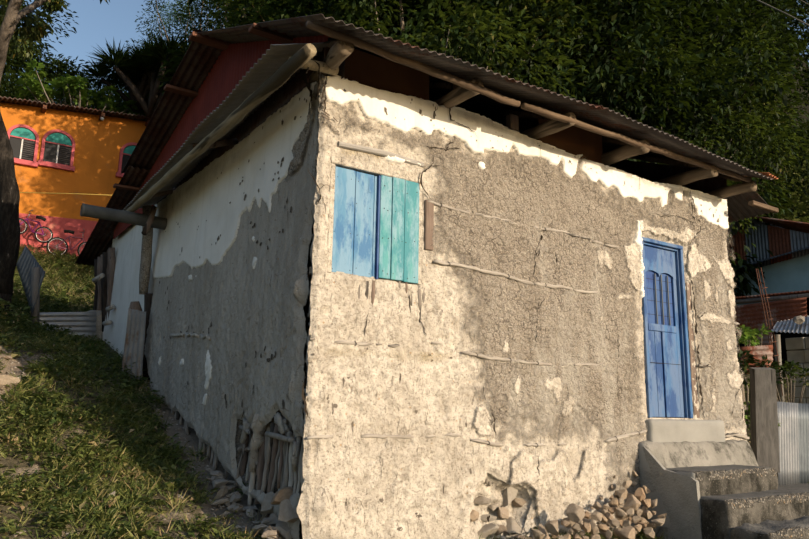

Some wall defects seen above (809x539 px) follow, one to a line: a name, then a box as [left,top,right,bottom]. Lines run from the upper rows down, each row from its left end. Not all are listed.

crack [308,171,326,213]
crack [420,142,459,198]
spalling [151,75,745,539]
crack [687,278,709,415]
crack [300,381,311,420]